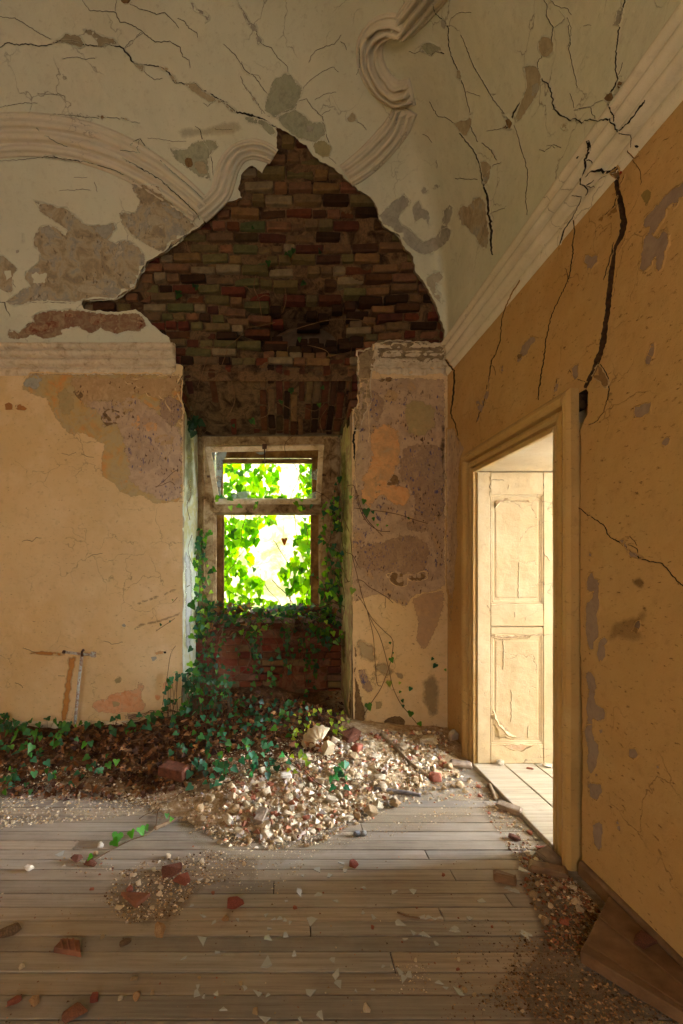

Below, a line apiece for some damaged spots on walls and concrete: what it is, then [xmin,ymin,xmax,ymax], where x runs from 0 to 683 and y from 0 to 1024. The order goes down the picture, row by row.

crack [0,0,361,220]
crack [409,4,561,255]
crack [537,0,669,426]
peeling [639,181,683,273]
spalling [0,66,493,651]
crack [579,506,683,586]
peeling [91,674,168,721]